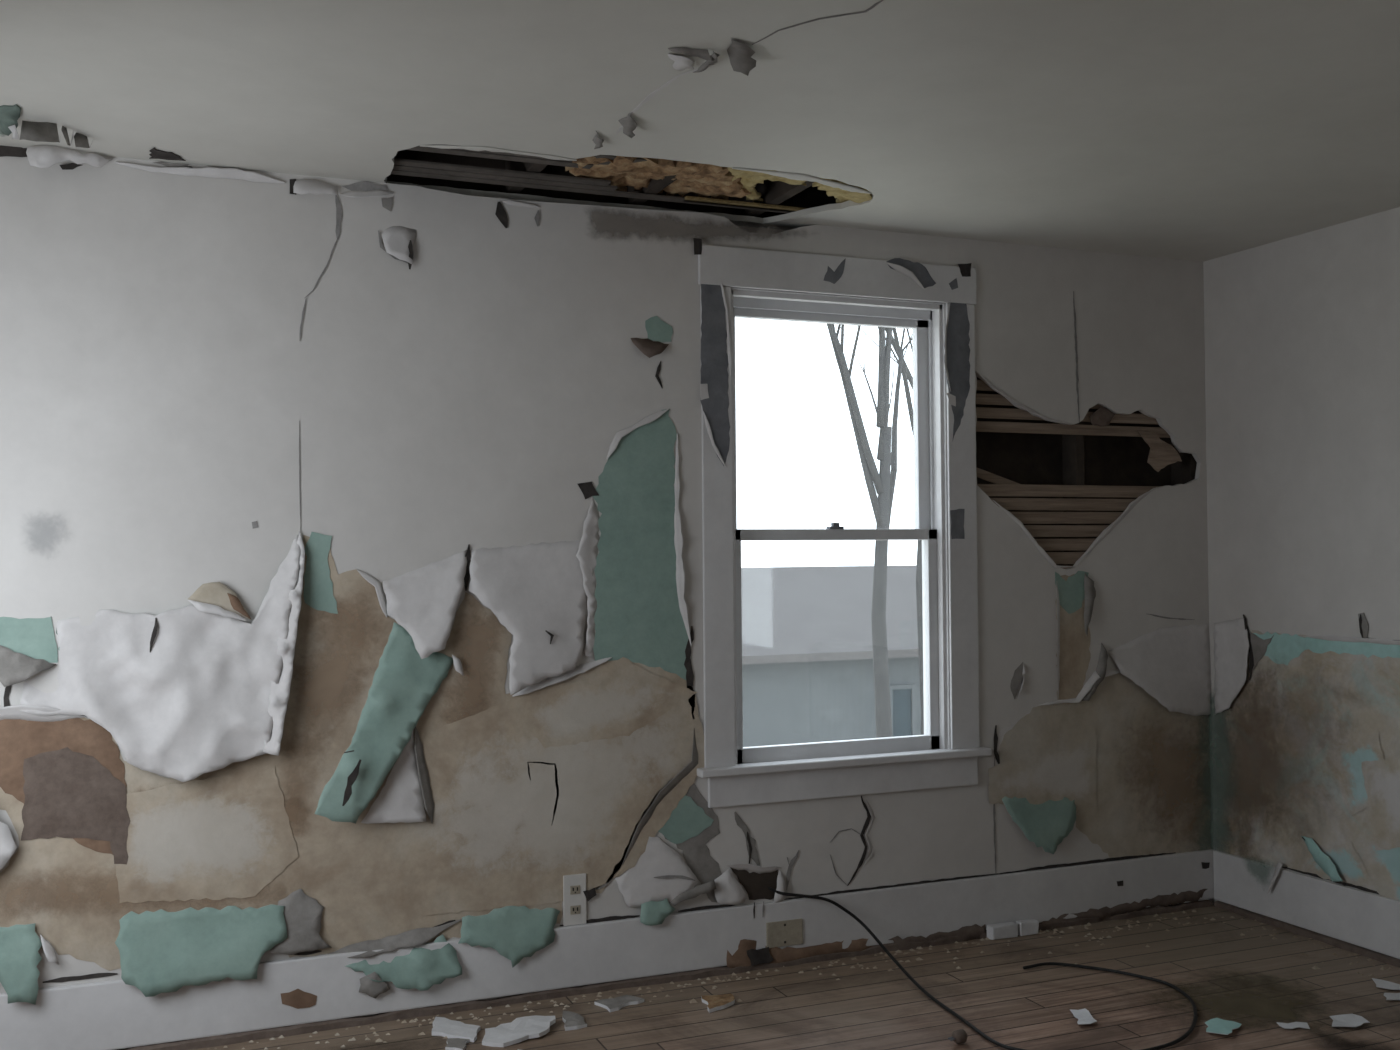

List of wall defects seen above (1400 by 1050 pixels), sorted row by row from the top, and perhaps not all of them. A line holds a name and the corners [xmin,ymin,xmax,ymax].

crack [592,0,883,149]
peeling [0,104,416,270]
spalling [732,167,872,194]
crack [300,195,342,339]
peeling [886,258,1400,901]
crack [43,973,118,983]
peeling [281,989,317,1009]
peeling [0,409,786,1005]
crack [560,915,640,926]
crack [678,904,734,912]
crack [734,795,1176,900]
leakage [1208,702,1229,849]